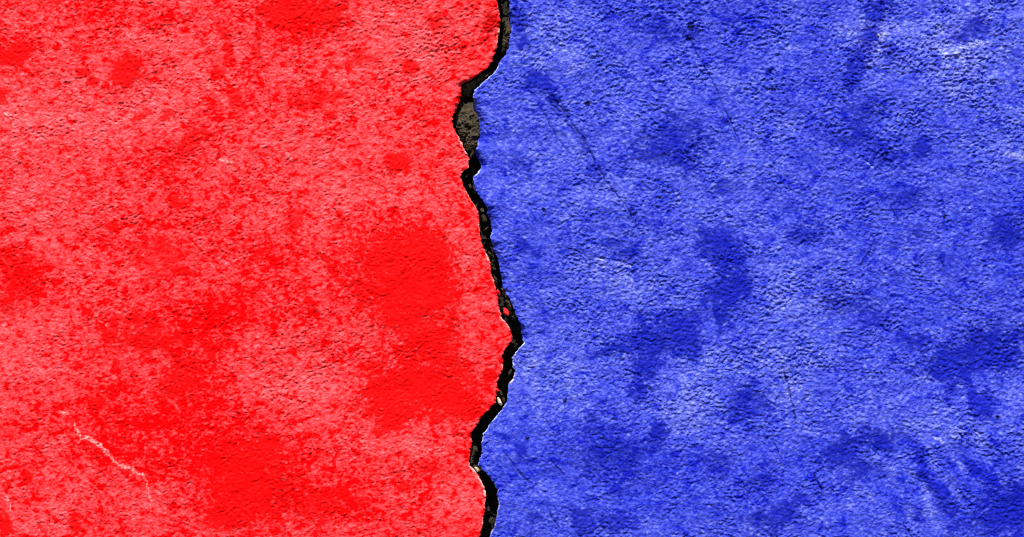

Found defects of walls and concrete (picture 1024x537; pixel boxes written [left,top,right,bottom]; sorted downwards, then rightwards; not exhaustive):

crack [449,0,529,537]